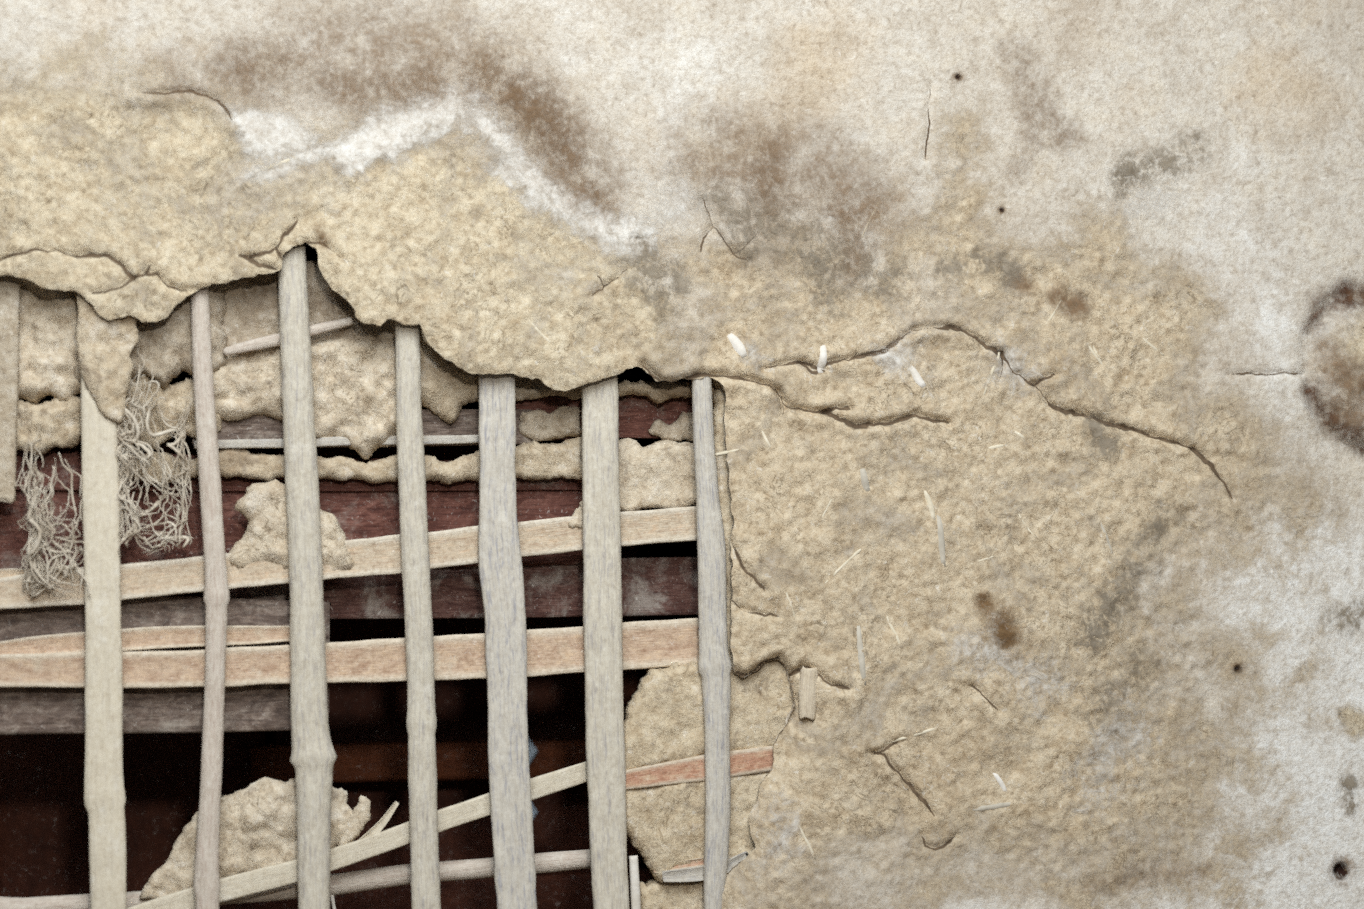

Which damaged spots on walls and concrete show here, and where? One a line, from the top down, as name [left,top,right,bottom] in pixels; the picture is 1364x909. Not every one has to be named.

flaking render [0,73,685,391]
leakage [631,235,689,315]
leakage [700,150,904,315]
leakage [936,248,1031,289]
crack [642,324,1233,499]
flaking render [672,168,1322,909]